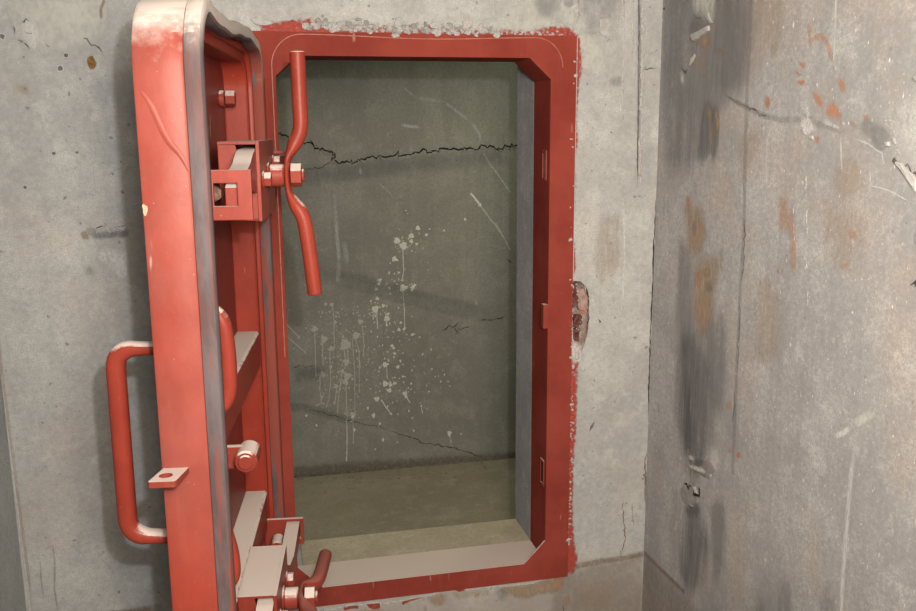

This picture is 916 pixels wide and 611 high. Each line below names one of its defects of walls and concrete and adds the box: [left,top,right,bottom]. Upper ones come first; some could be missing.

spalling [301,0,611,90]
crack [278,132,517,170]
crack [727,95,766,117]
flaking render [879,73,916,192]
spalling [569,272,595,439]
spalling [680,483,702,514]